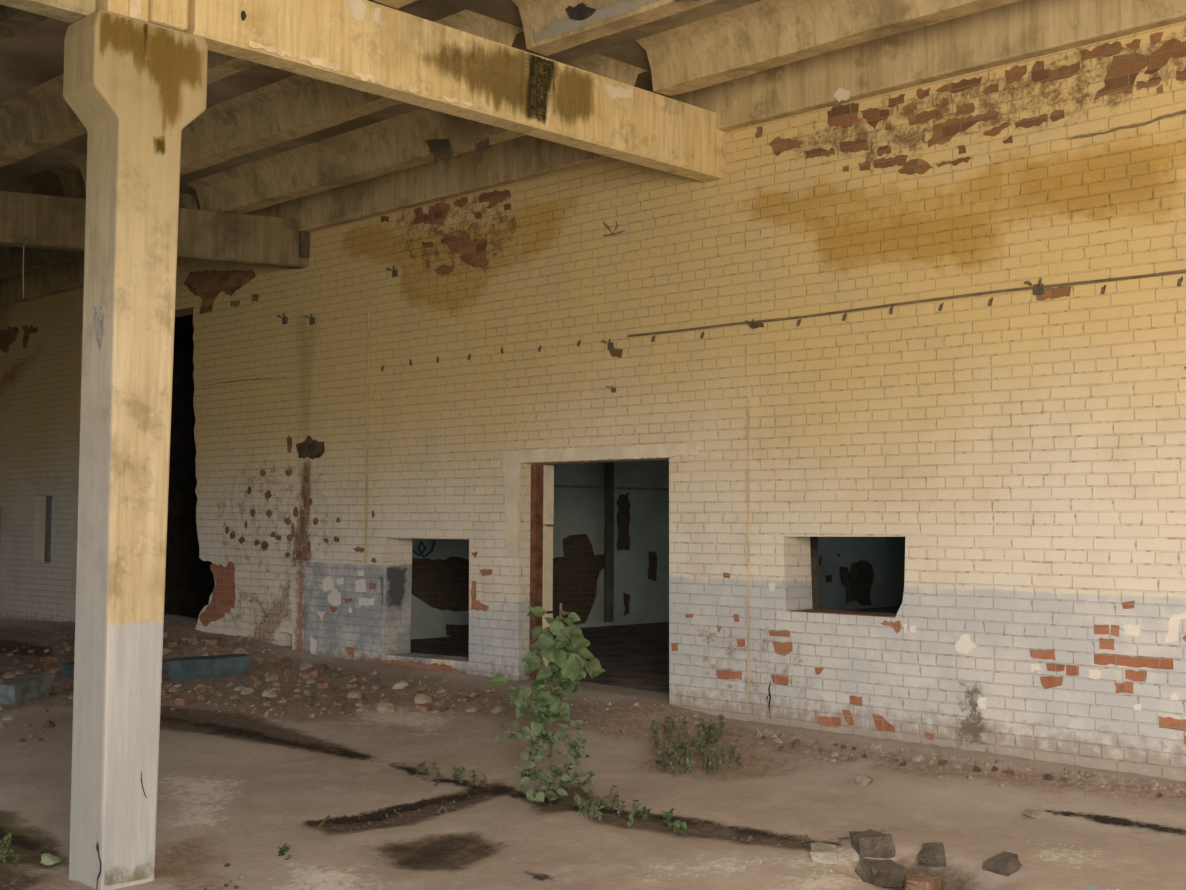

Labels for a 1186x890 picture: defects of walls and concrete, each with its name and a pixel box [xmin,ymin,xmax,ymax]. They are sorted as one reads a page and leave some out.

flaking render [755,32,1186,175]
flaking render [381,189,516,275]
flaking render [184,270,259,314]
spalling [285,435,325,476]
spalling [225,490,340,560]
corrosion [293,463,311,566]
flaking render [199,561,267,626]
peeling [317,547,376,621]
flaking render [764,630,793,656]
flaking render [1030,624,1173,710]
flaking render [817,696,895,733]
flaking render [1159,716,1186,745]